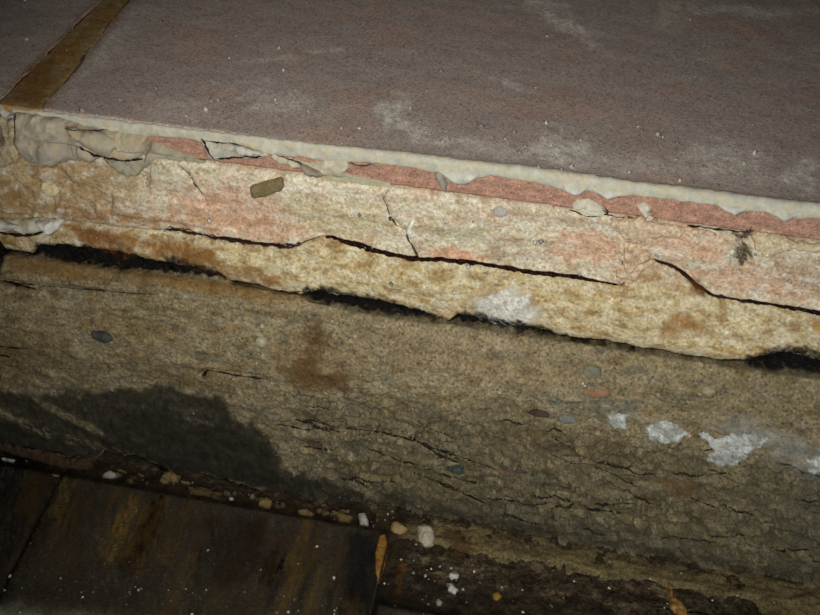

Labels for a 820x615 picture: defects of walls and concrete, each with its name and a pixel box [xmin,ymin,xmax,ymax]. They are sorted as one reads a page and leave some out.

peeling [201,138,351,179]
peeling [0,217,65,237]
crack [166,189,623,286]
crack [570,208,635,218]
crack [233,282,302,292]
crack [654,259,820,316]
crack [202,370,263,379]
leakage [607,413,629,429]
crack [278,424,497,470]
leakage [645,420,768,467]
leakage [806,455,820,474]
leakage [0,384,589,615]